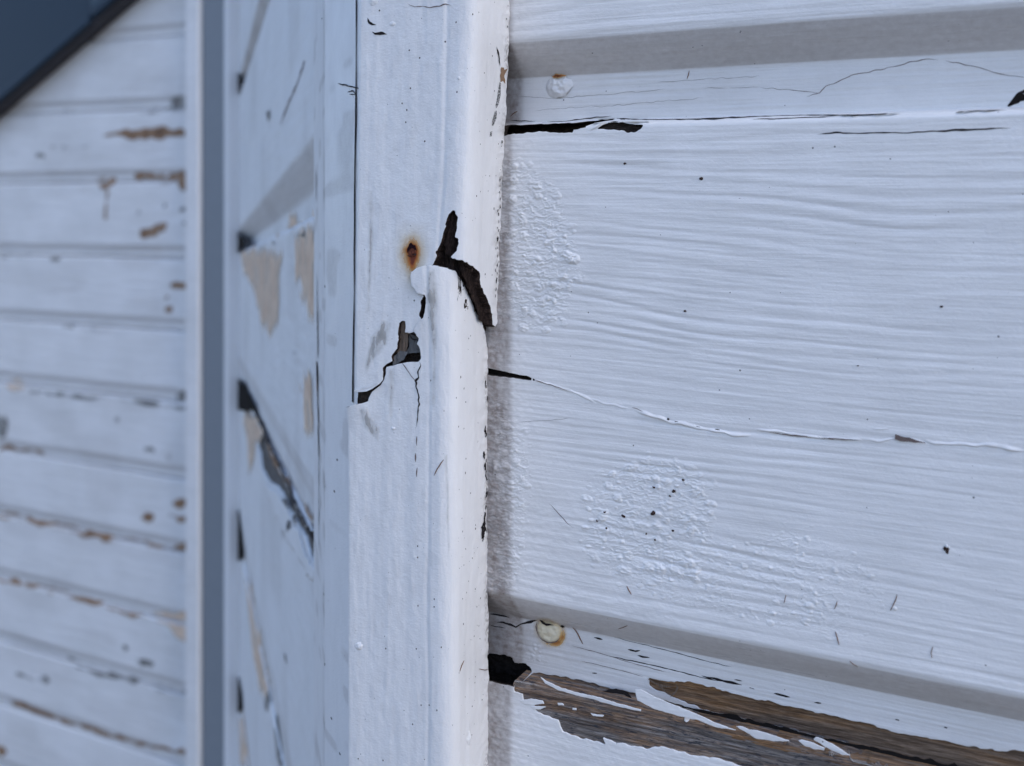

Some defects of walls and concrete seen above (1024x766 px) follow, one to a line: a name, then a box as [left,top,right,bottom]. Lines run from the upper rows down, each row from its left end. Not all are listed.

peeling [106,126,185,140]
crack [511,59,1024,134]
peeling [98,177,116,219]
peeling [135,171,186,190]
peeling [241,210,314,336]
rust [402,238,420,271]
peeling [303,370,313,434]
crack [488,368,1024,453]
peeling [243,381,314,582]
crack [491,614,789,697]
peeling [513,670,1024,766]